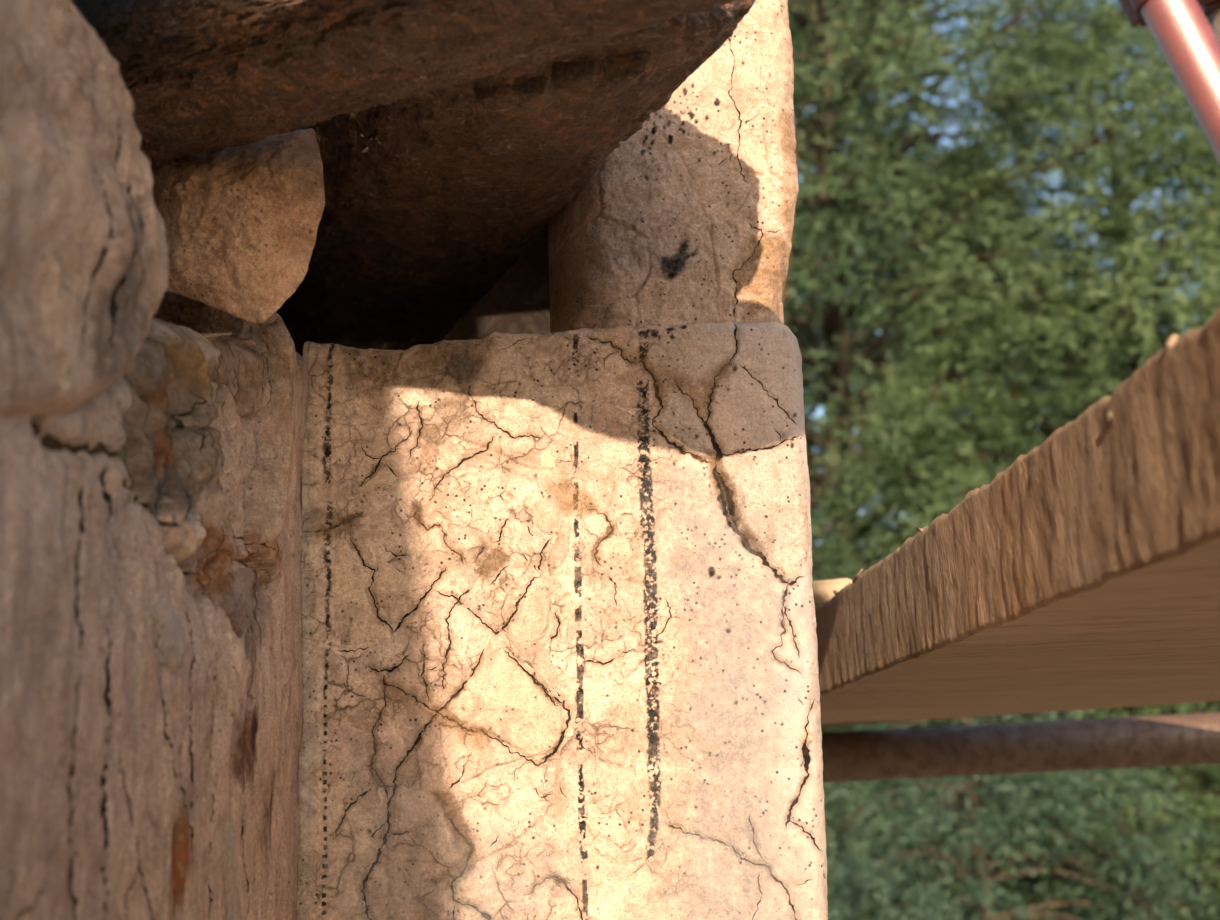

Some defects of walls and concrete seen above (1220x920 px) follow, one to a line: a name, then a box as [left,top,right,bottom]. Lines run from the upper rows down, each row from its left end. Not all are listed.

crack [718,38,753,184]
crack [17,418,181,920]
crack [171,388,207,451]
crack [147,536,275,920]
crack [302,391,593,920]
crack [586,222,822,851]
crack [667,813,812,920]